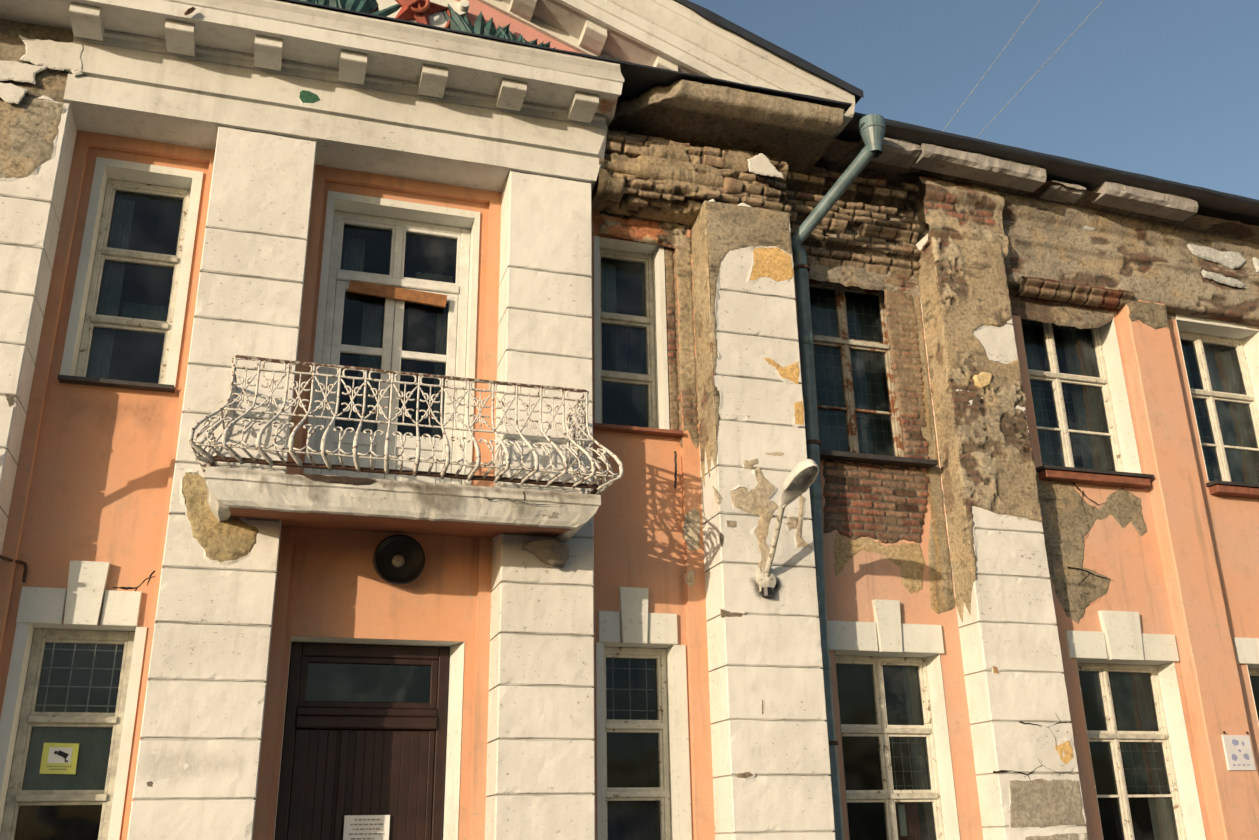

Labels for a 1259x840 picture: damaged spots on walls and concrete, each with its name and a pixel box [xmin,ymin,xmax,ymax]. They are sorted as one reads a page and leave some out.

spalling [0,95,69,182]
peeling [1187,243,1259,288]
spalling [599,198,1185,624]
spalling [179,468,259,566]
peeling [1009,810,1086,839]